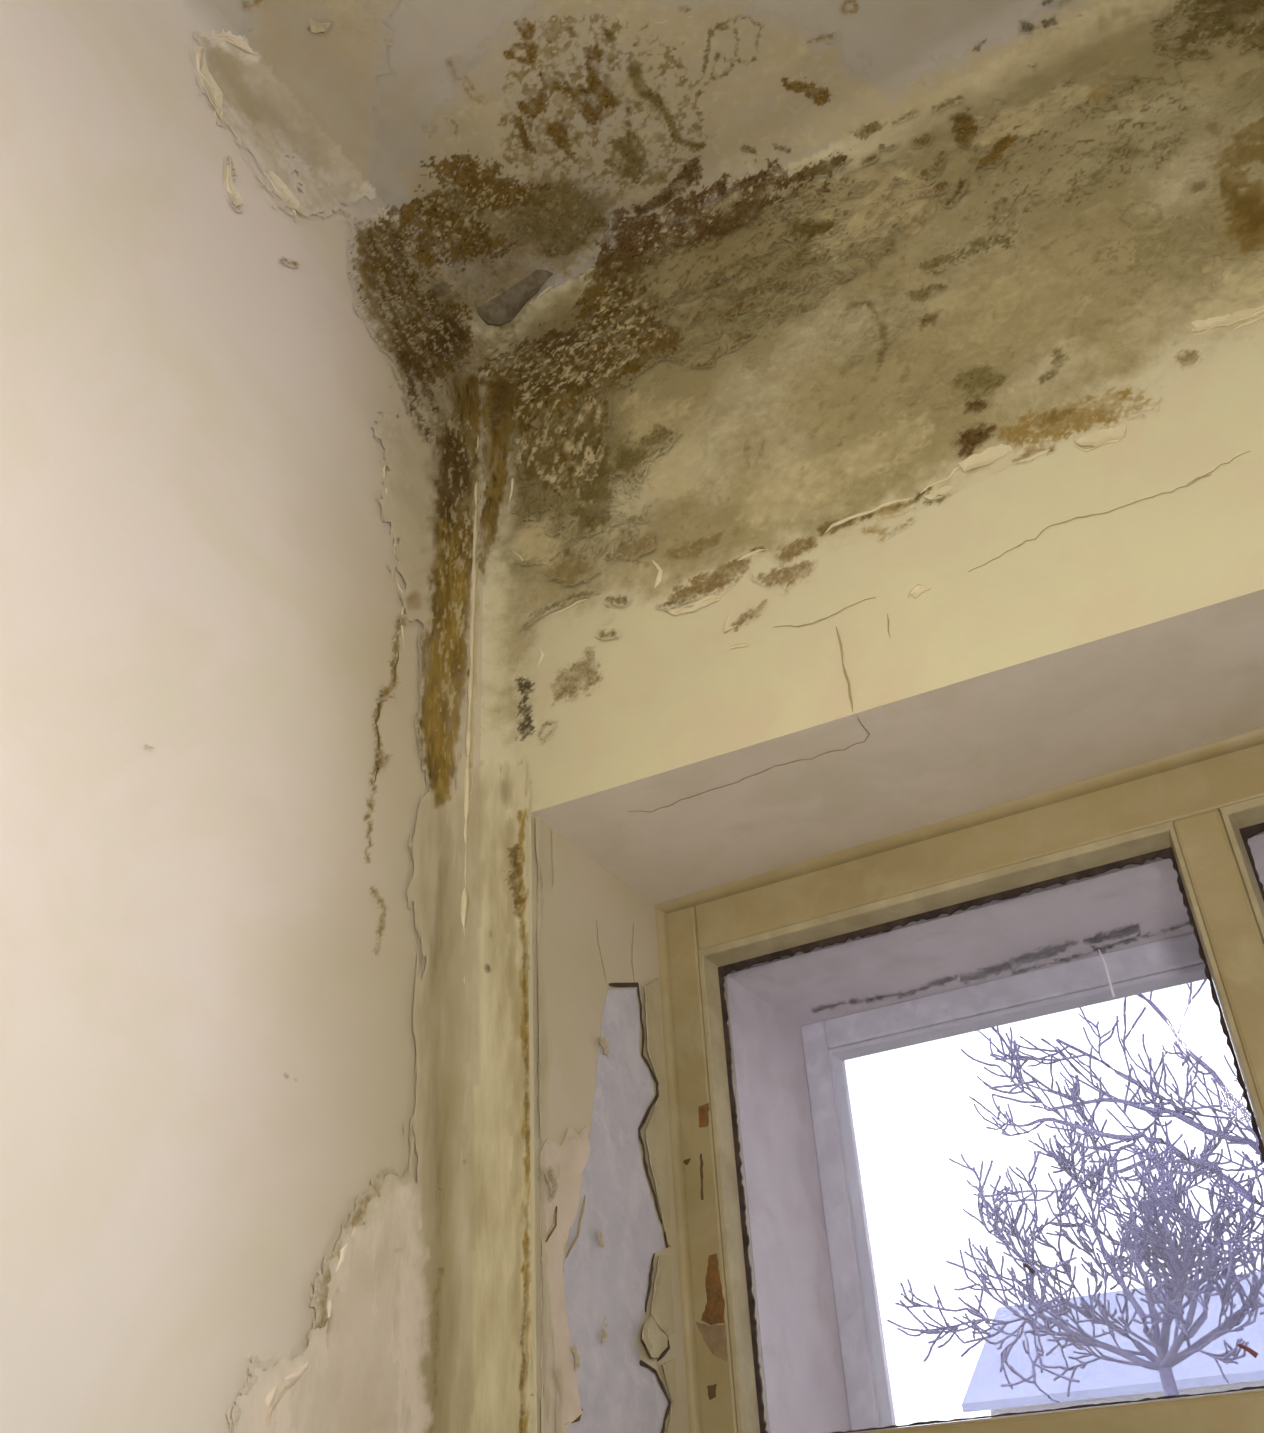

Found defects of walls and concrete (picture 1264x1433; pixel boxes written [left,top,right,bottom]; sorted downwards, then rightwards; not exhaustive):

peeling [189,0,401,222]
peeling [278,255,301,269]
peeling [1191,305,1264,335]
crack [361,407,445,957]
peeling [522,550,629,630]
peeling [596,627,618,641]
crack [628,597,891,812]
water stain [341,0,1264,1433]
peeling [613,424,1127,653]
crack [968,451,1249,572]
peeling [227,1165,436,1433]
spalling [538,978,703,1433]